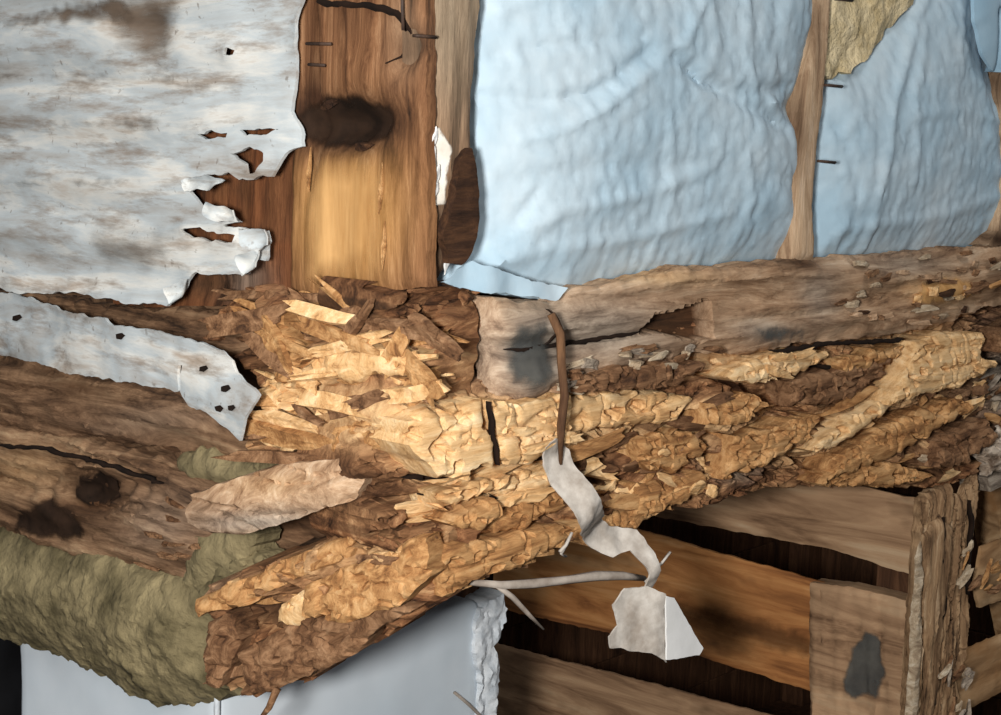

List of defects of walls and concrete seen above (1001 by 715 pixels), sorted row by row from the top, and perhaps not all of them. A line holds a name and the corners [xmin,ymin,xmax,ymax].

peeling [181,175,269,276]
peeling [163,279,187,304]
crack [486,401,500,466]
crack [401,474,450,496]
crack [942,500,975,620]
damp [844,633,885,698]